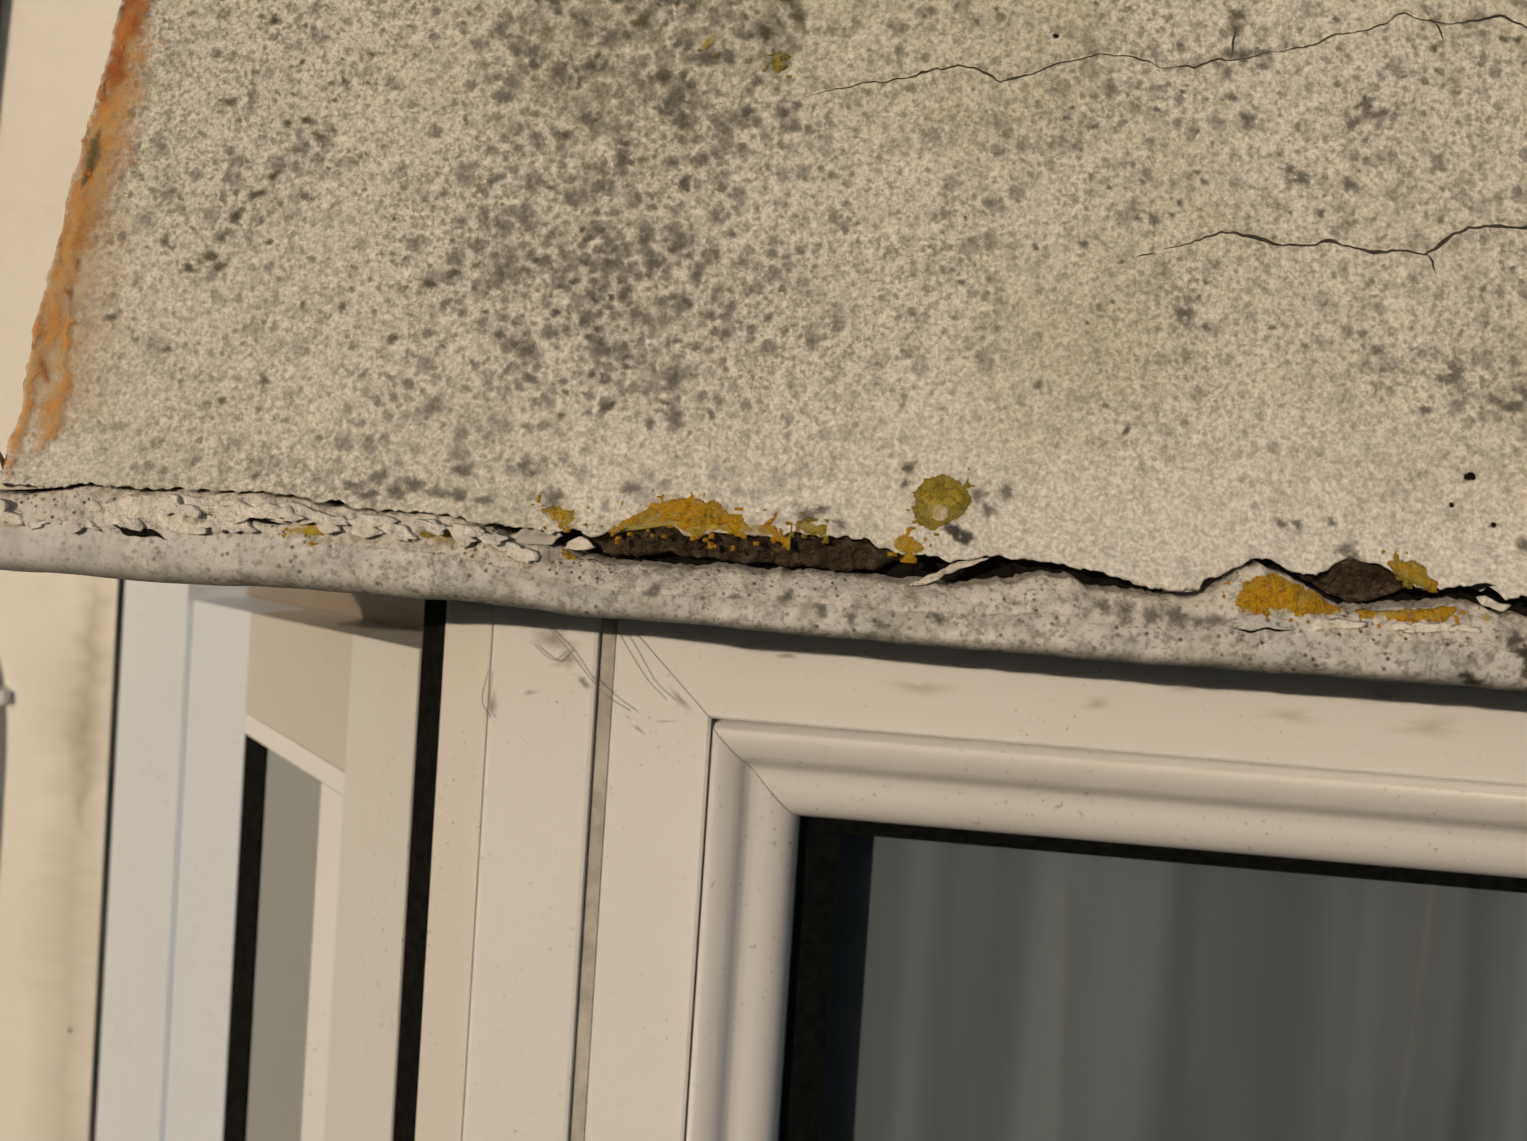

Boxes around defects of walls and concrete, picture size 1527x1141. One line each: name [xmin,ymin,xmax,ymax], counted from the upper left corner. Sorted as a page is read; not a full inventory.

mould [495,0,693,87]
crack [786,12,1527,102]
rust [6,0,162,476]
leakage [183,172,276,271]
crack [1137,224,1527,273]
mould [524,256,630,383]
mould [645,374,681,428]
crack [12,482,94,491]
flaking render [0,470,904,572]
crack [557,524,1211,593]
flaking render [910,558,989,586]
crack [1252,557,1527,616]